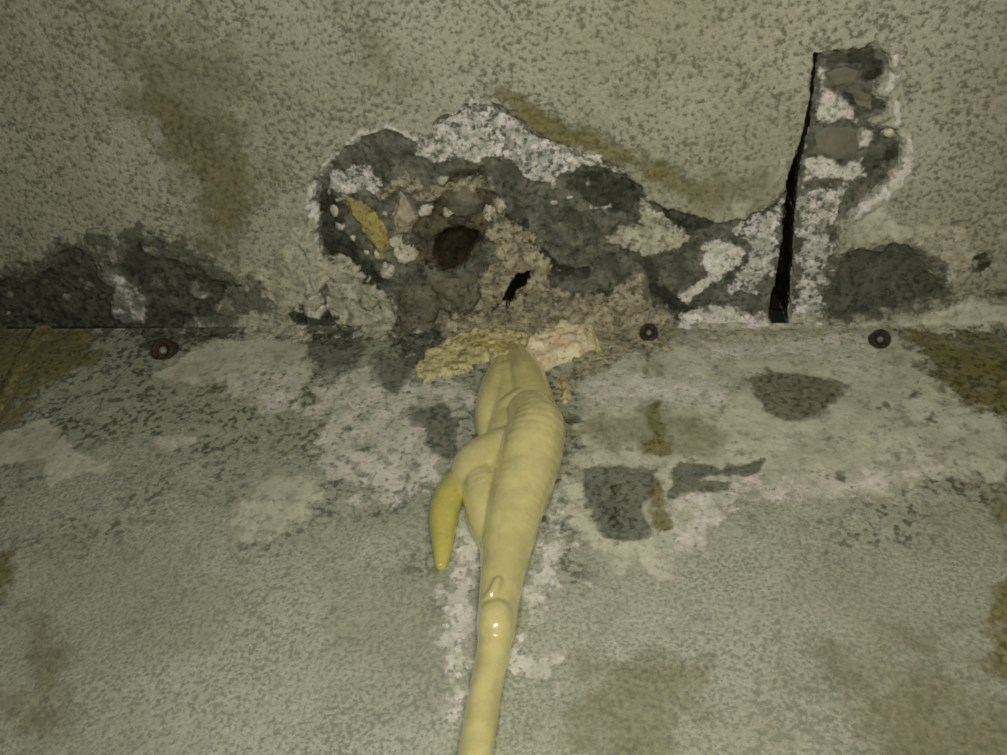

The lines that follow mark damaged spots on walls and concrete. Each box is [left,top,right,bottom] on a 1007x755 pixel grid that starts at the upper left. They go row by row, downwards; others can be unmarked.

water stain [0,79,539,369]
spalling [289,40,938,404]
crack [768,52,818,323]
spalling [0,238,242,328]
peeling [410,403,459,459]
peeling [749,368,843,421]
peeling [584,465,658,542]
peeling [667,458,765,499]